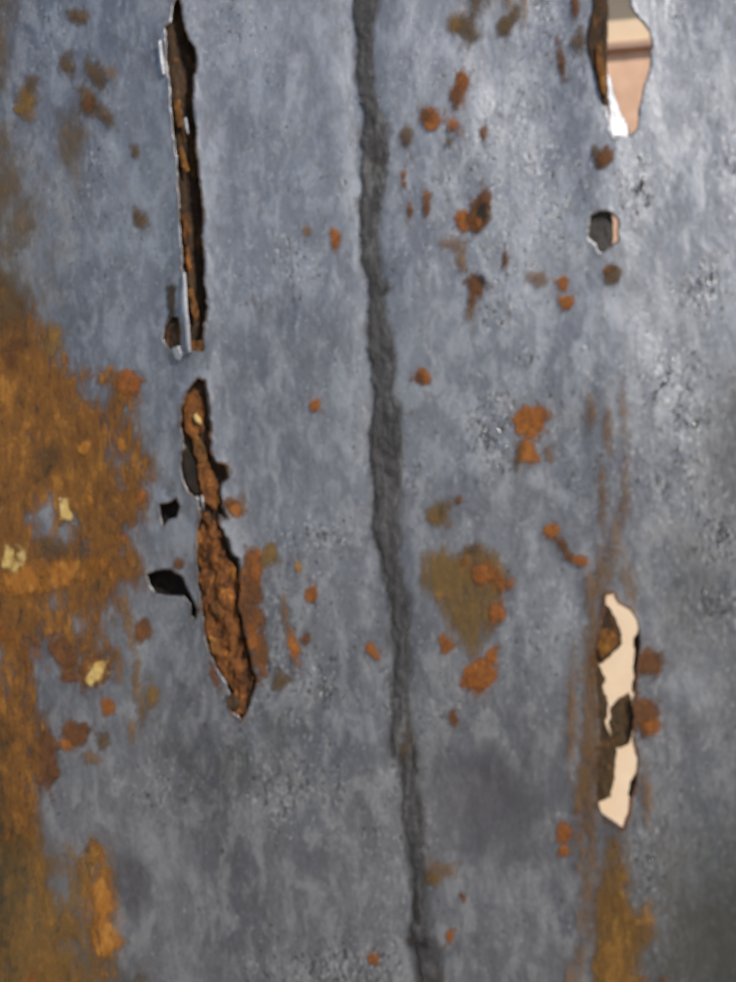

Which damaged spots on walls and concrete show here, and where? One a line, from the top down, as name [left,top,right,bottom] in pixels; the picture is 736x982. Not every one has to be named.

peeling [596,47,607,96]
rust [162,0,207,352]
rust [406,191,433,222]
rust [442,180,493,319]
rust [528,272,574,312]
rust [603,262,623,285]
rust [502,403,556,472]
rust [0,284,247,982]
rust [238,542,311,690]
rust [421,544,514,699]
rust [542,523,638,686]
rust [576,634,667,982]